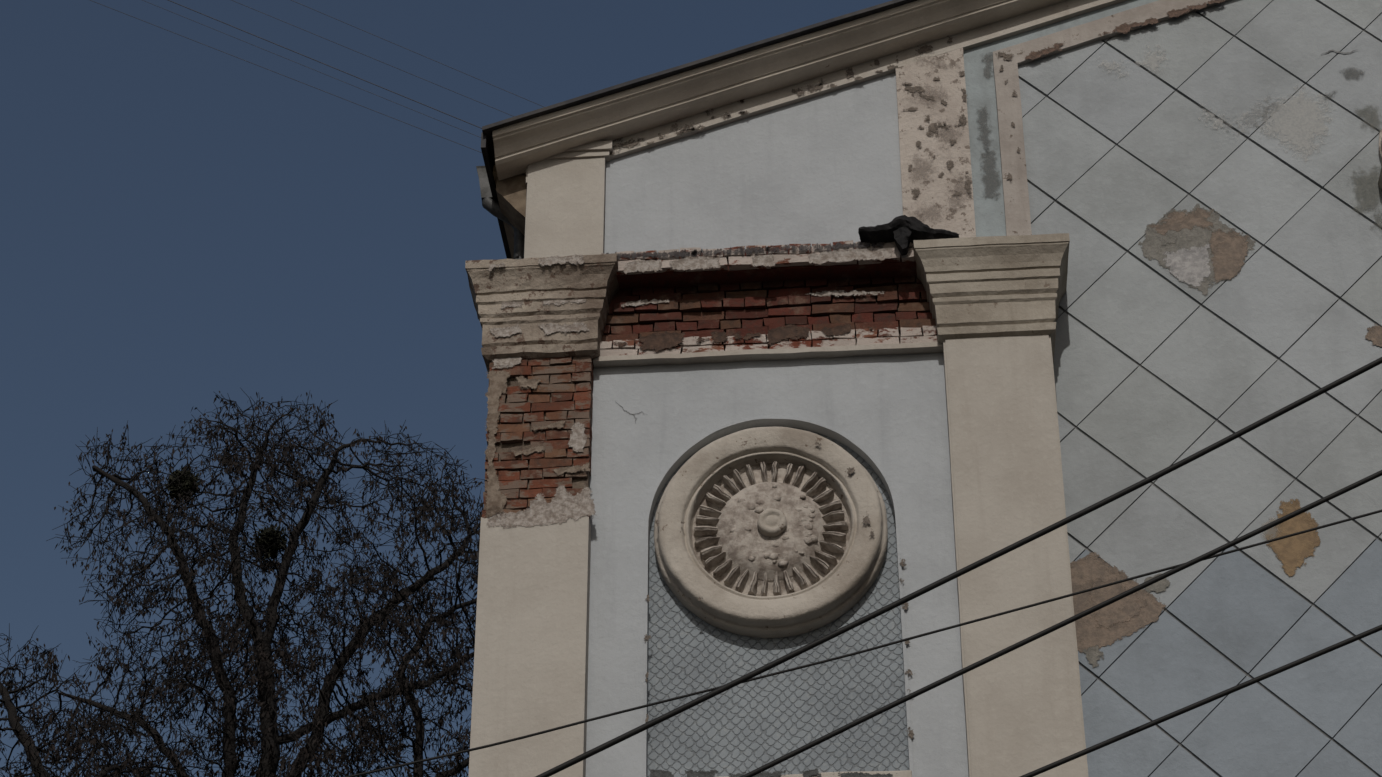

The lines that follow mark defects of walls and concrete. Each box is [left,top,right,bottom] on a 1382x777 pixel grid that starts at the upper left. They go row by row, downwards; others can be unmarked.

peeling [915,36,953,54]
peeling [995,41,1065,96]
peeling [1099,0,1225,37]
peeling [792,55,974,198]
flaking render [1139,203,1256,296]
flaking render [1365,324,1382,347]
flaking render [482,240,938,528]
flaking render [1264,499,1320,576]
flaking render [1070,552,1171,668]
peeling [650,769,897,777]